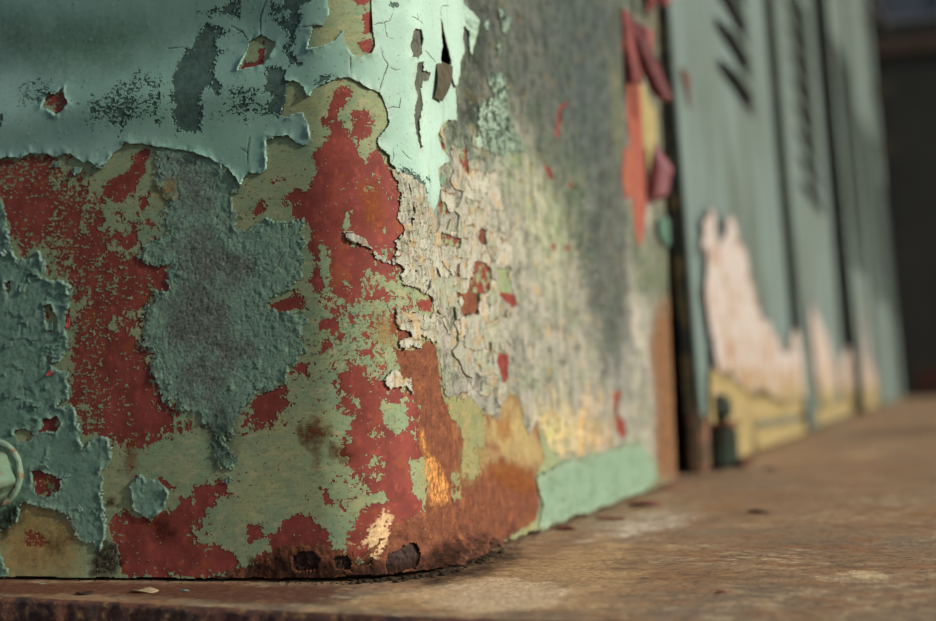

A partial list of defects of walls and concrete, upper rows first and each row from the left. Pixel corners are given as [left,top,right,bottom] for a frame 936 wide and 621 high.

crack [373,5,449,109]
peeling [0,0,678,593]
peeling [699,204,878,411]
corrosion [0,324,545,604]